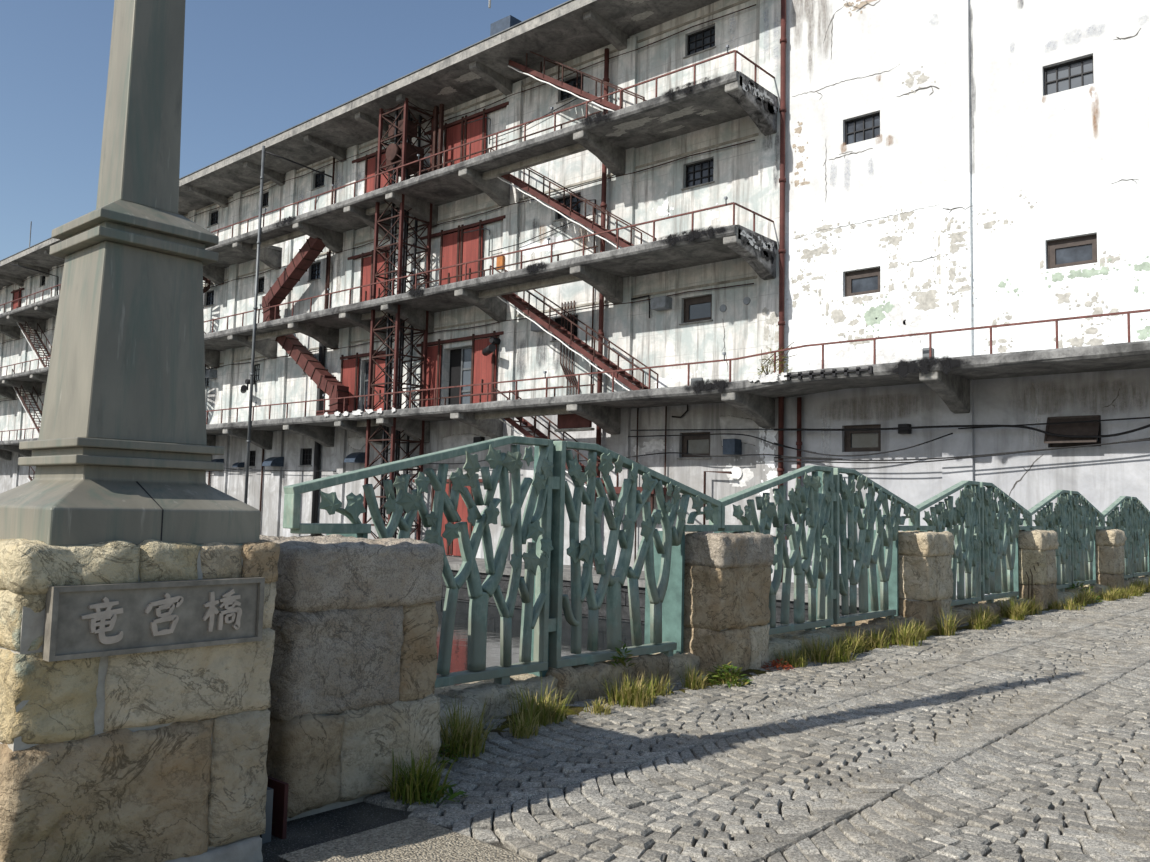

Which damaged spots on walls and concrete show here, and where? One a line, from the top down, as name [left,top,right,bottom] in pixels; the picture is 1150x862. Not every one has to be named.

crack [792,0,939,99]
spalling [742,79,778,114]
spalling [740,230,777,264]
peeling [791,206,1013,369]
peeling [1039,251,1150,348]
peeling [717,427,778,496]
crack [1009,454,1044,496]